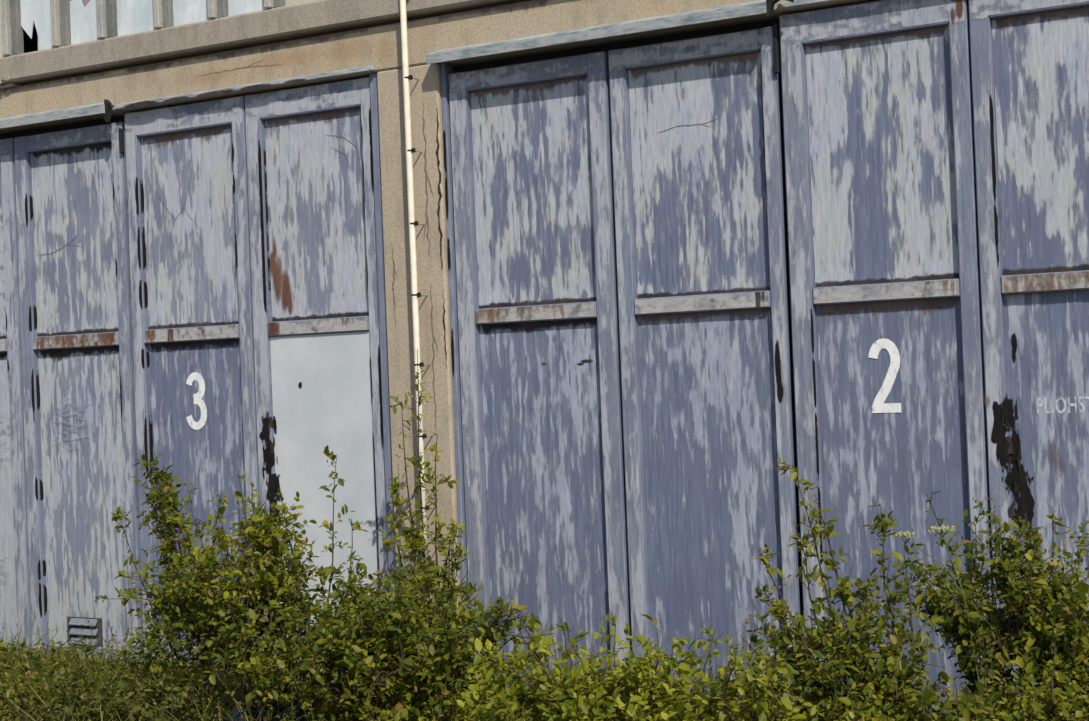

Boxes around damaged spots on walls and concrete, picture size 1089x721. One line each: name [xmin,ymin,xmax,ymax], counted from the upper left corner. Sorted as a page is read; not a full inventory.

crack [658,118,718,133]
corrosion [270,242,292,313]
crack [390,242,398,327]
crack [422,101,447,428]
corrosion [36,332,116,349]
peeling [0,76,388,660]
peeling [449,0,1089,690]